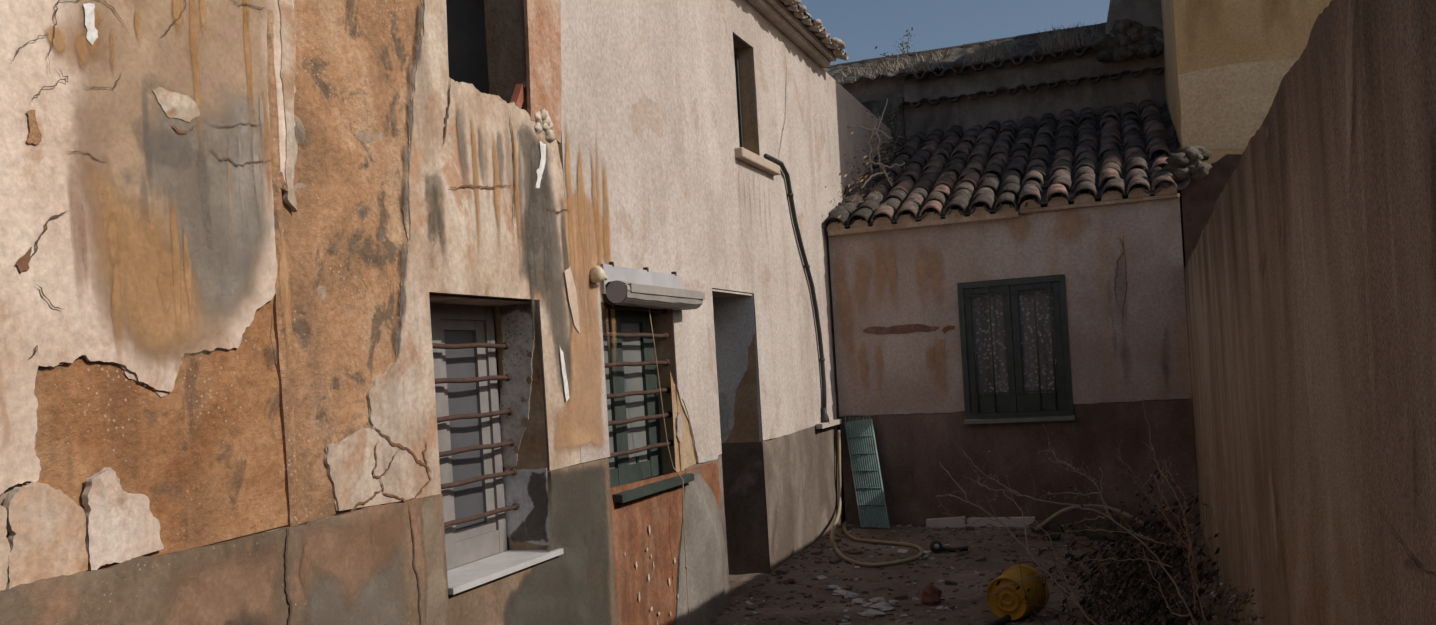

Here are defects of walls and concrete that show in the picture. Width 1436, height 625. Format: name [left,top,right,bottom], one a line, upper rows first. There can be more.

crack [30,211,66,309]
water stain [47,0,271,355]
spalling [0,0,423,591]
peeling [165,553,277,625]
crack [343,427,432,625]
flaking render [499,300,550,546]
water stain [457,111,611,388]
spalling [564,267,580,333]